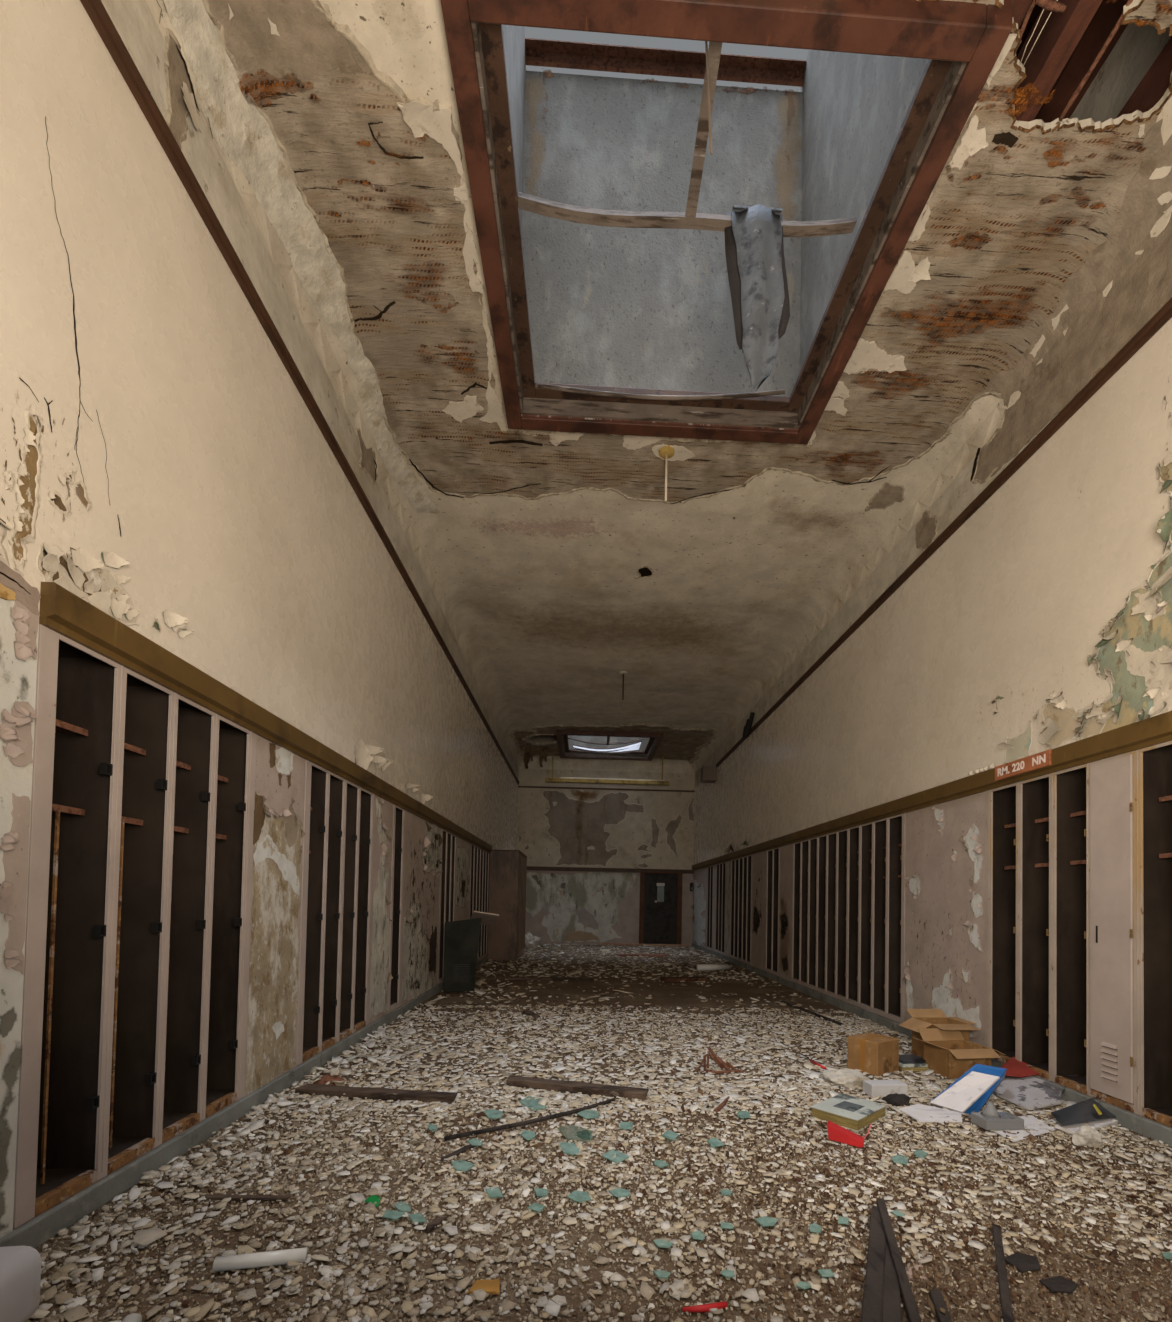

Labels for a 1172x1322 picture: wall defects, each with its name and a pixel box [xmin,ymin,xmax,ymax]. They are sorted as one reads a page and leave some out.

spalling [163,27,202,153]
crack [1,116,122,537]
spalling [202,0,1172,512]
peeling [11,600,39,660]
peeling [0,405,194,638]
spalling [915,509,938,551]
peeling [968,451,1172,775]
peeling [0,701,38,767]
peeling [0,793,31,975]
peeling [245,743,306,1095]
peeling [931,967,982,1039]
peeling [951,821,984,953]